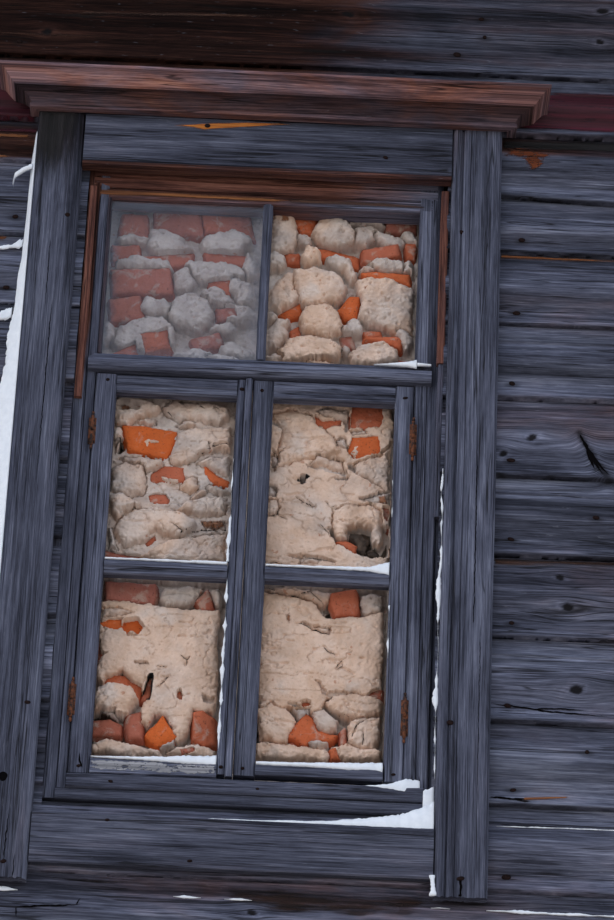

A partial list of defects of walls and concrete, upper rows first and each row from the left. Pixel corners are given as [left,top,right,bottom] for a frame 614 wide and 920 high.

corrosion [506,148,548,169]
crack [580,435,609,475]
spalling [348,533,387,559]
crack [473,442,607,802]